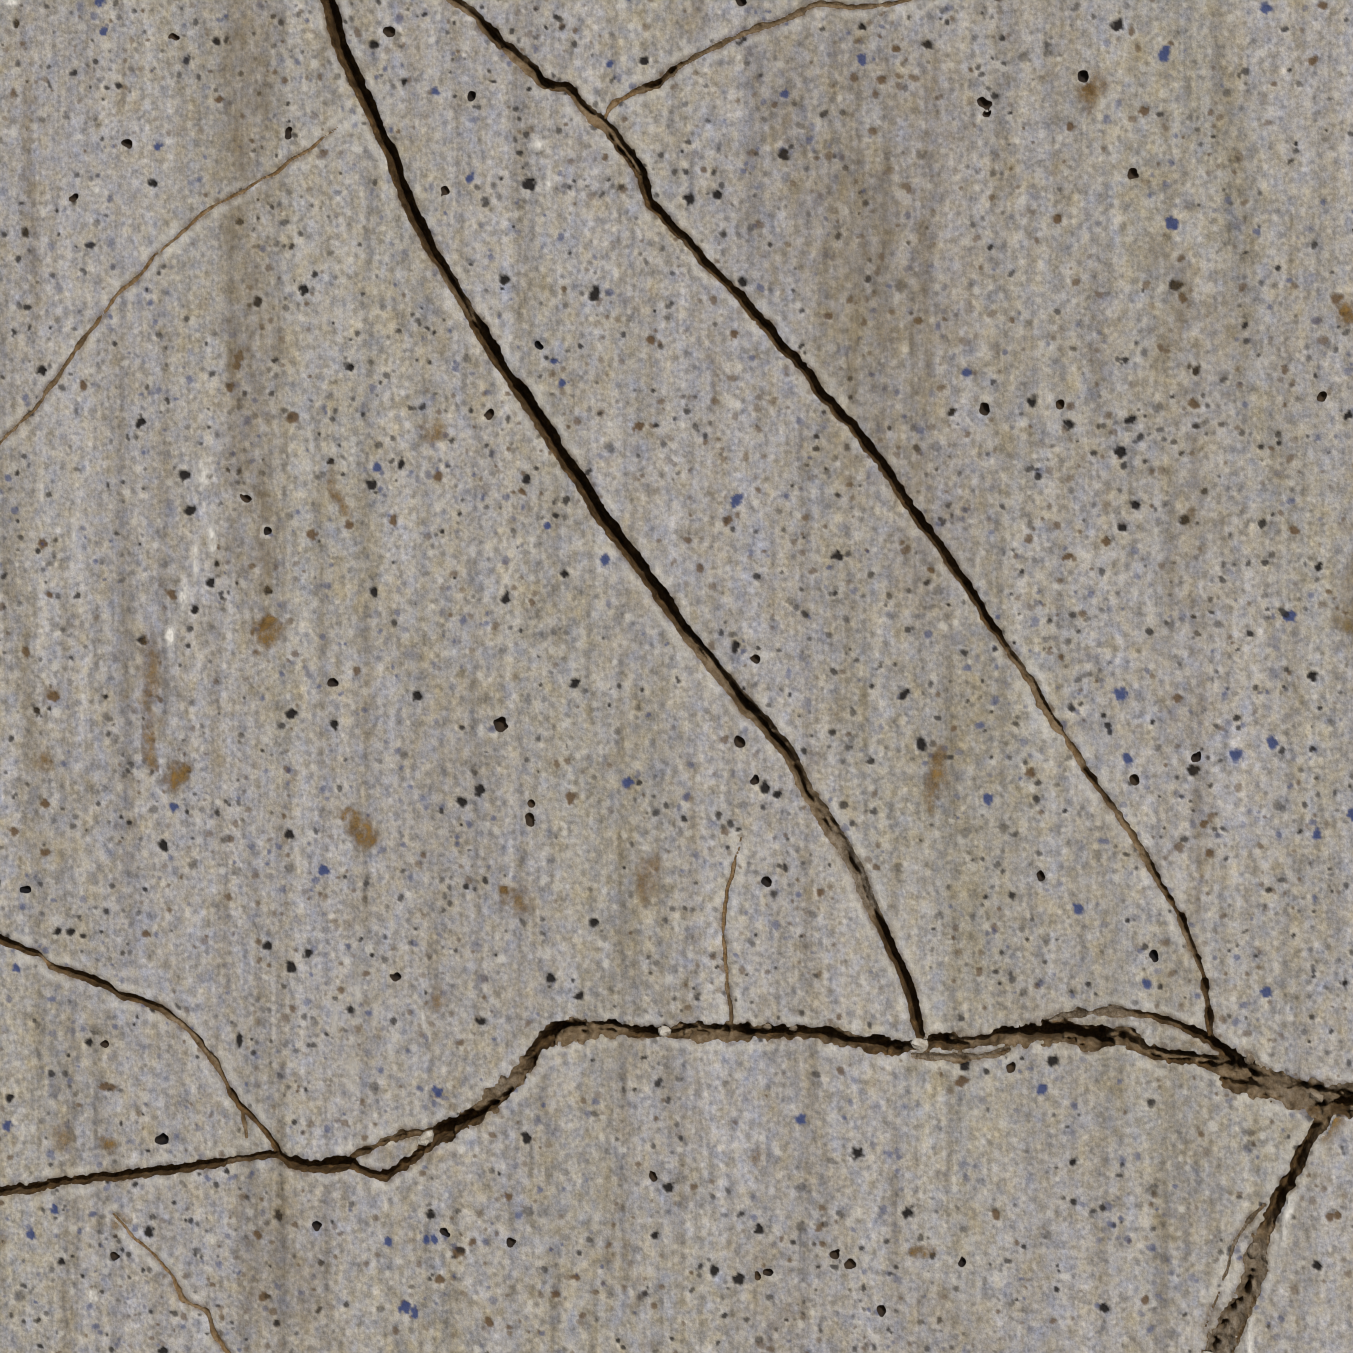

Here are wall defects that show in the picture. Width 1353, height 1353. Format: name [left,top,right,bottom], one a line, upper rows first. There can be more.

crack [0,127,338,445]
crack [320,0,1214,1039]
crack [0,847,1353,1196]
crack [113,1213,231,1353]
crack [1201,1110,1334,1353]